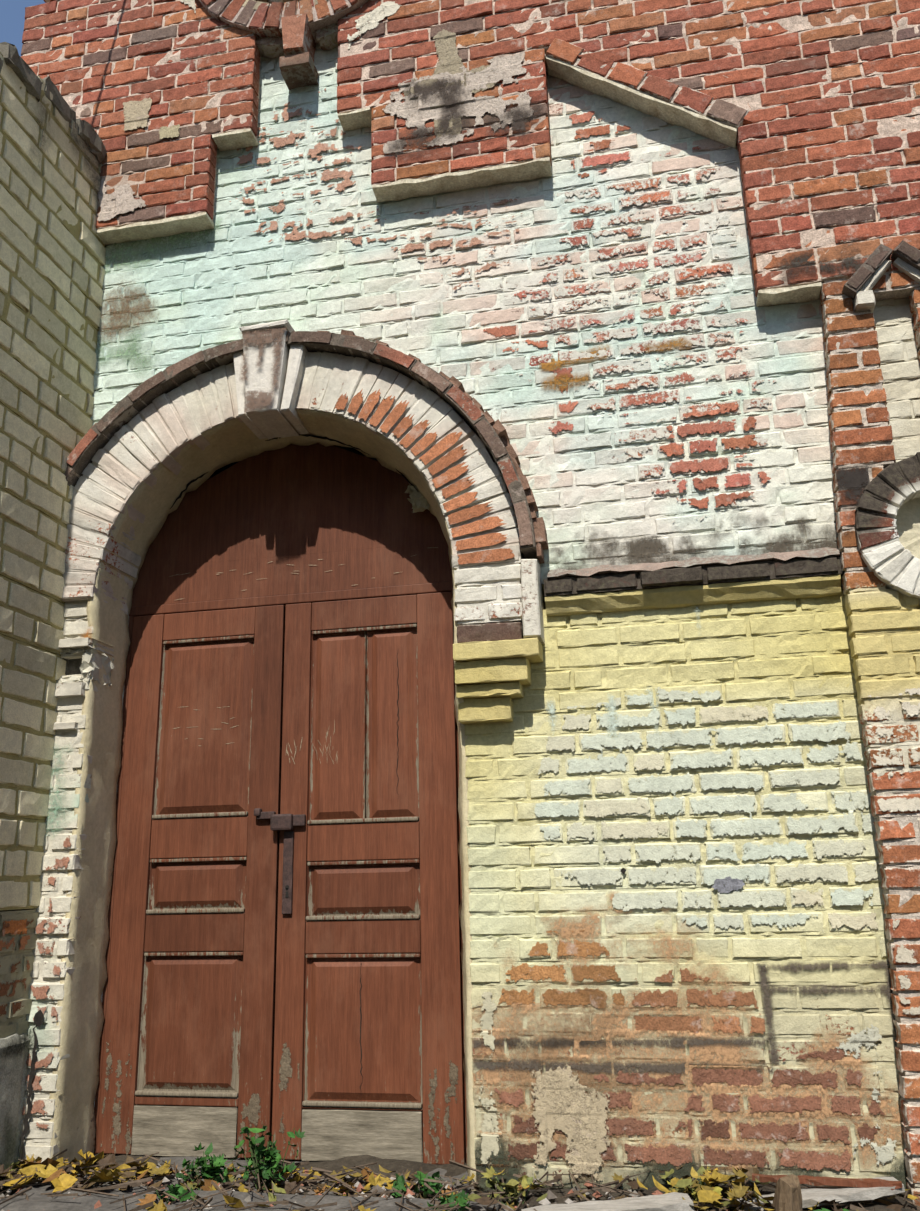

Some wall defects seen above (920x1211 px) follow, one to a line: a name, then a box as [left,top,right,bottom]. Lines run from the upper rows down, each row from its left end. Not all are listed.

peeling [230,102,527,293]
leakage [99,293,150,336]
peeling [483,111,777,520]
leakage [64,327,538,559]
peeling [334,389,515,564]
spalling [439,371,549,564]
leakage [556,535,714,570]
leakage [741,517,838,555]
leakage [0,1032,34,1056]
crack [20,1009,44,1164]
peeling [479,930,766,1060]
peeling [478,1024,898,1182]